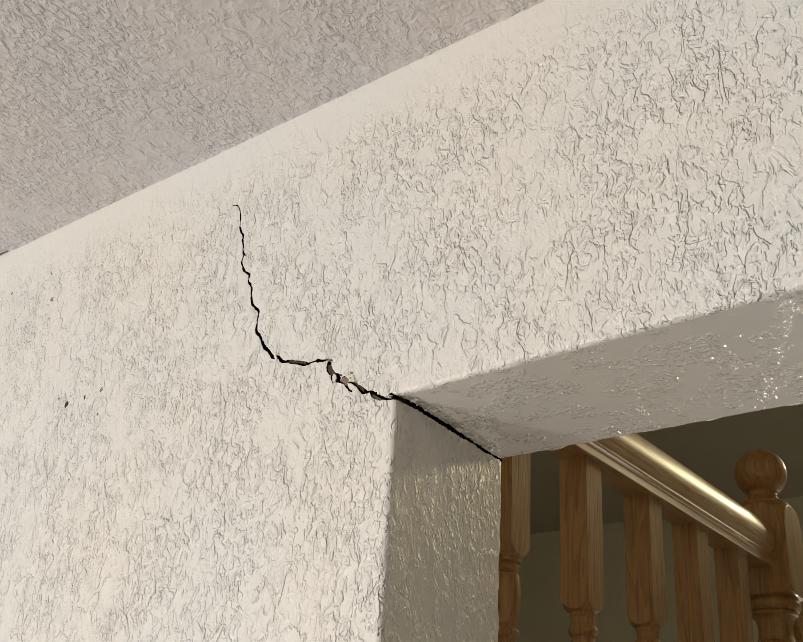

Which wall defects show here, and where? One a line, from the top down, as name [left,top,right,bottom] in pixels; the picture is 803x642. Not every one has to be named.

crack [233,205,503,464]